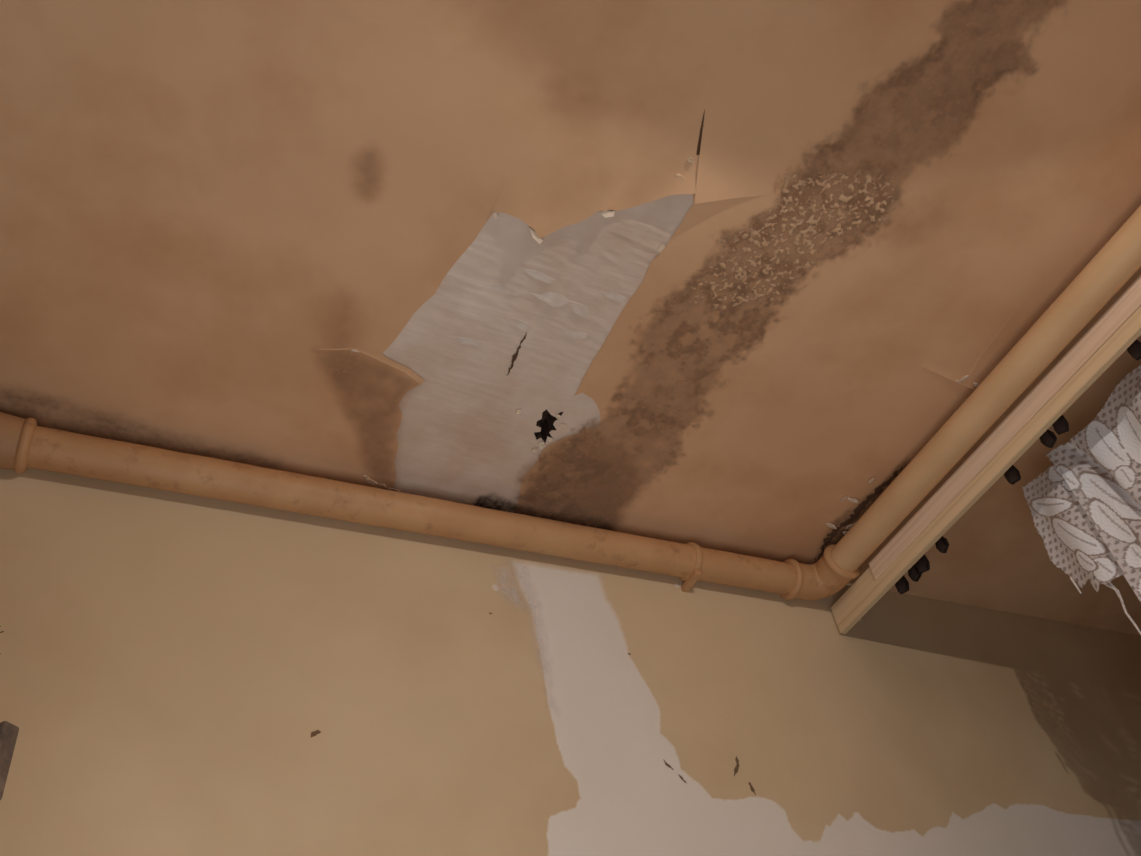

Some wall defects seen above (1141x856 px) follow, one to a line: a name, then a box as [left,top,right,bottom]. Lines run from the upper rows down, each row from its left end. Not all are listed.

peeling [362,142,700,513]
damp [475,323,712,530]
damp [662,0,1048,349]